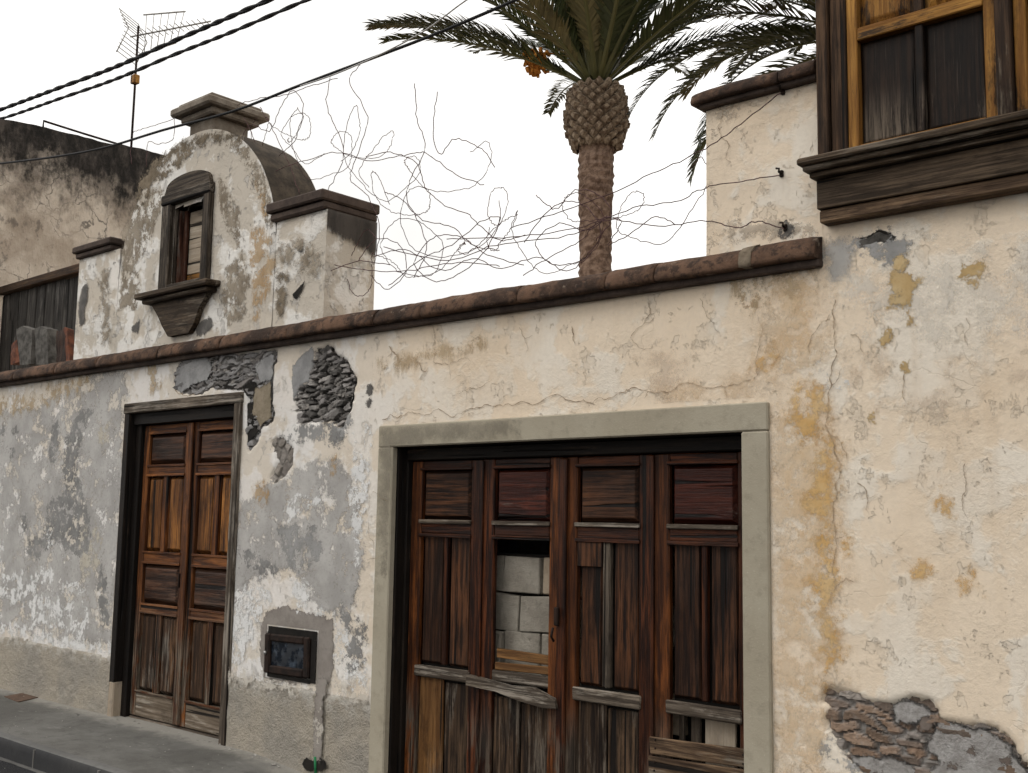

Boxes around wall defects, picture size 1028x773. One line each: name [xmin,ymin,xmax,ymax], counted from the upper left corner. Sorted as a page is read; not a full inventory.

peeling [0,371,128,654]
spalling [196,318,213,336]
spalling [172,350,278,451]
peeling [231,345,373,691]
crack [382,300,875,613]
water stain [770,404,847,773]
spalling [807,689,1028,773]